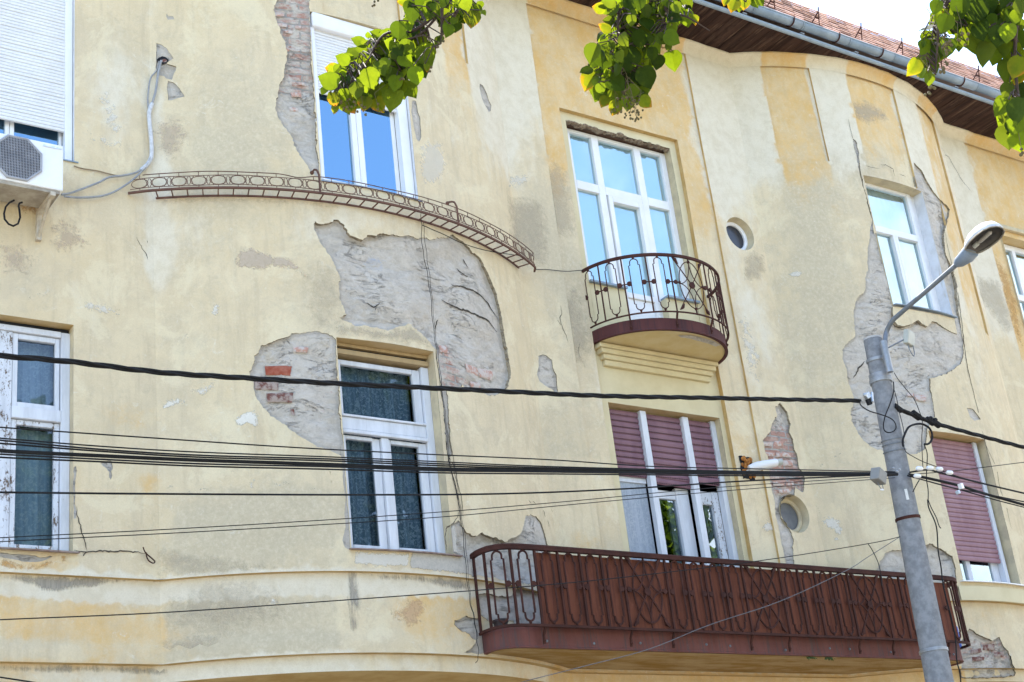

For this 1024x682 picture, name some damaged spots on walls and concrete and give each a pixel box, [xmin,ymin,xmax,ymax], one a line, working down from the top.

spalling [274,0,319,176]
spalling [236,331,551,654]
spalling [314,220,511,457]
crack [435,259,498,550]
spalling [537,354,558,392]
spalling [763,403,805,564]
spalling [877,550,907,580]
spalling [842,139,964,454]
spalling [926,543,956,583]
spalling [959,629,1016,679]